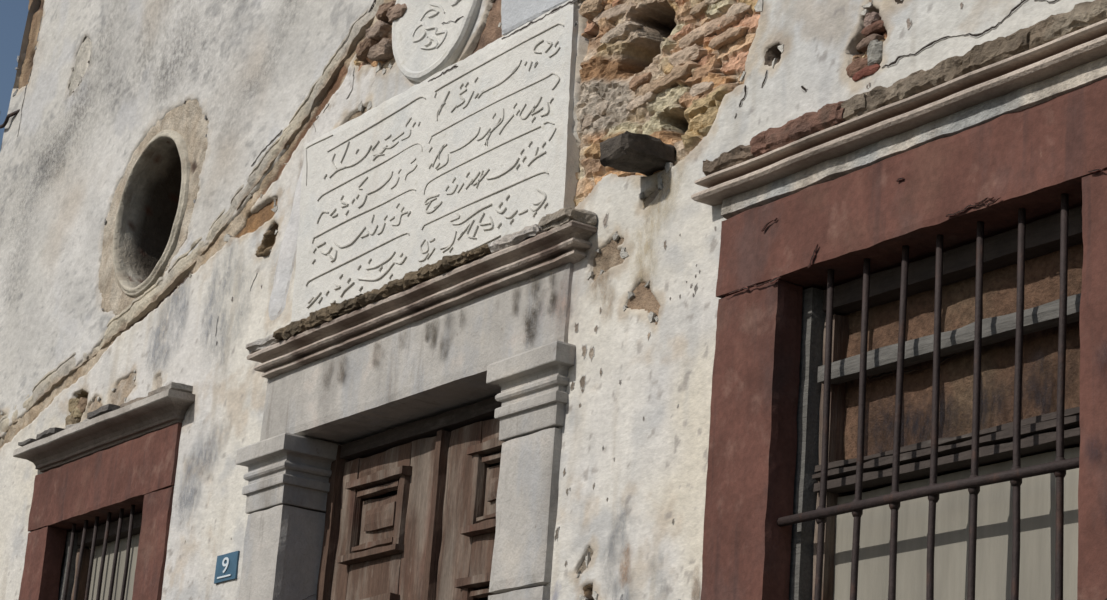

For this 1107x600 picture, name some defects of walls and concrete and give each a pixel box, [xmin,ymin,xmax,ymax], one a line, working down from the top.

spalling [764,43,784,68]
spalling [846,2,887,89]
crack [882,0,1060,69]
spalling [573,0,764,208]
spalling [0,0,407,448]
peeling [586,213,629,282]
peeling [623,264,701,341]
spalling [564,548,598,600]